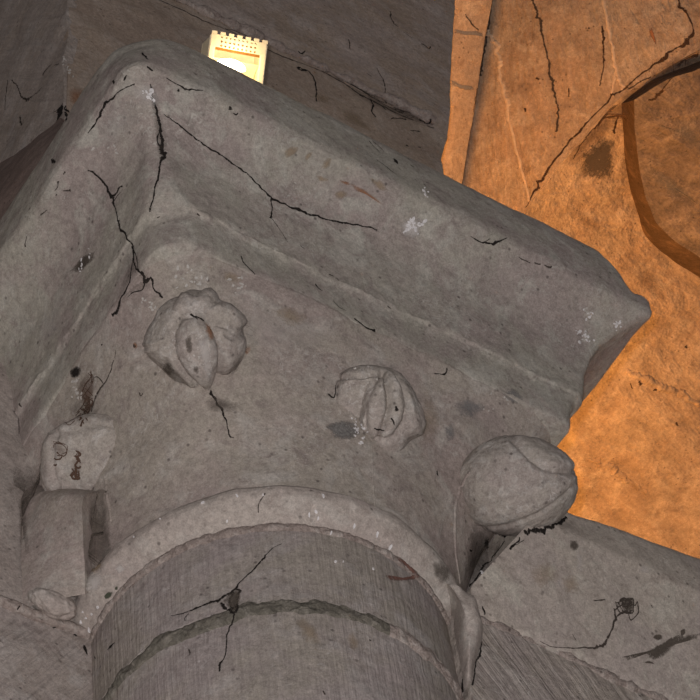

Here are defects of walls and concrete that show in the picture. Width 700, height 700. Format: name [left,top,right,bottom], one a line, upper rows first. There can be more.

crack [88,52,377,248]
crack [525,0,699,208]
crack [88,170,163,317]
crack [209,390,234,438]
crack [171,544,281,672]
crack [469,516,568,587]
crack [540,599,632,649]